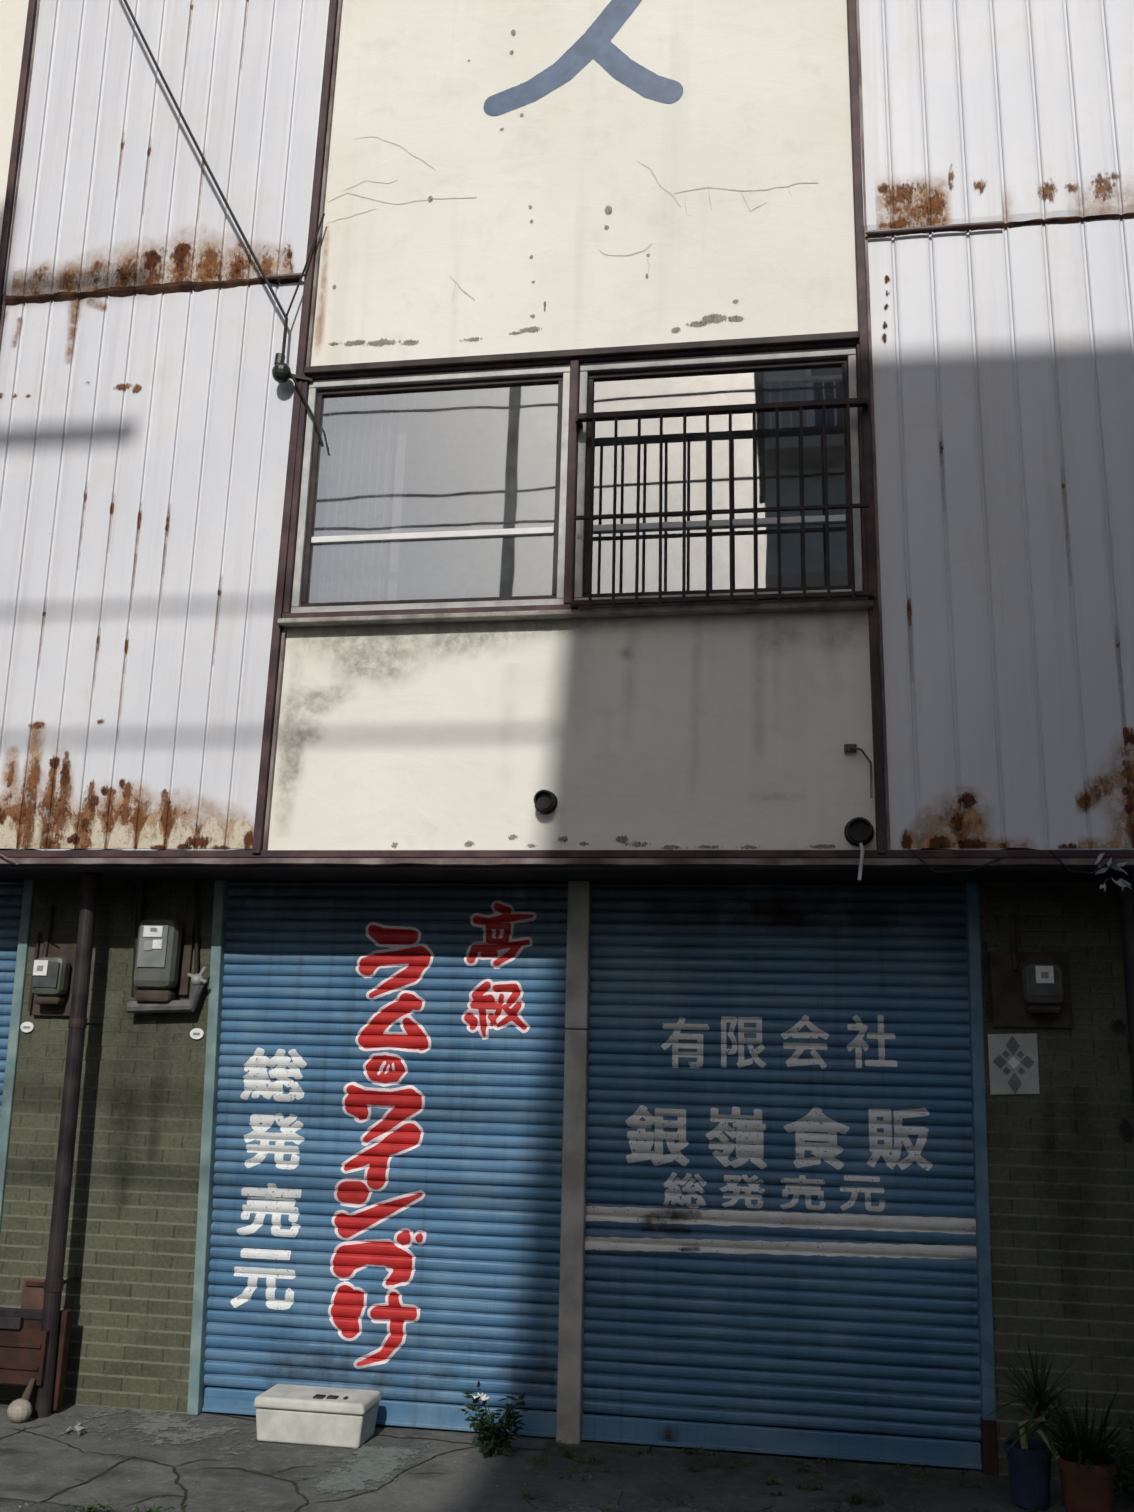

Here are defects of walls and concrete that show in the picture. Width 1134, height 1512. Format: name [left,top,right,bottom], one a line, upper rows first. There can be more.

crack [328,136,477,223]
corrosion [867,164,1134,237]
corrosion [5,238,302,355]
peeling [328,338,419,347]
peeling [509,302,546,335]
corrosion [0,722,254,849]
corrosion [901,792,1027,849]
corrosion [1058,743,1134,849]
crack [0,1424,545,1512]